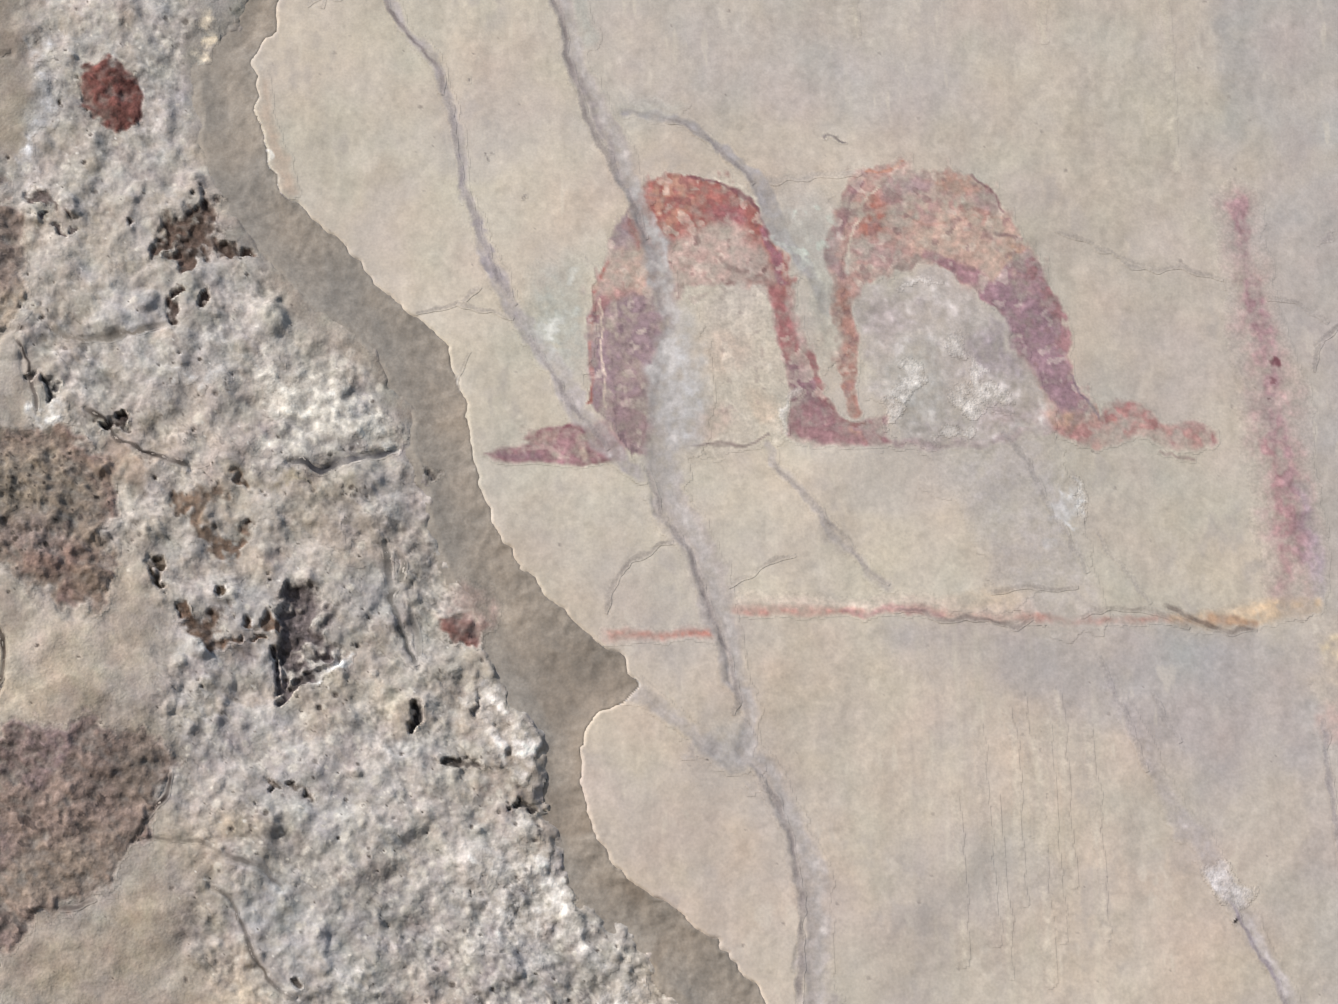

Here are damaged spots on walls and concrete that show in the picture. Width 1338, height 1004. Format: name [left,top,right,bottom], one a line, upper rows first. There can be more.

hole [22,195,80,238]
hole [146,188,260,310]
crack [1054,229,1224,282]
spalling [23,368,55,391]
crack [291,448,399,478]
crack [380,0,862,1004]
crack [761,429,1257,637]
spalling [150,568,194,622]
spalling [198,578,350,708]
hole [253,776,316,808]
spalling [507,796,539,815]
crack [1095,652,1301,1004]